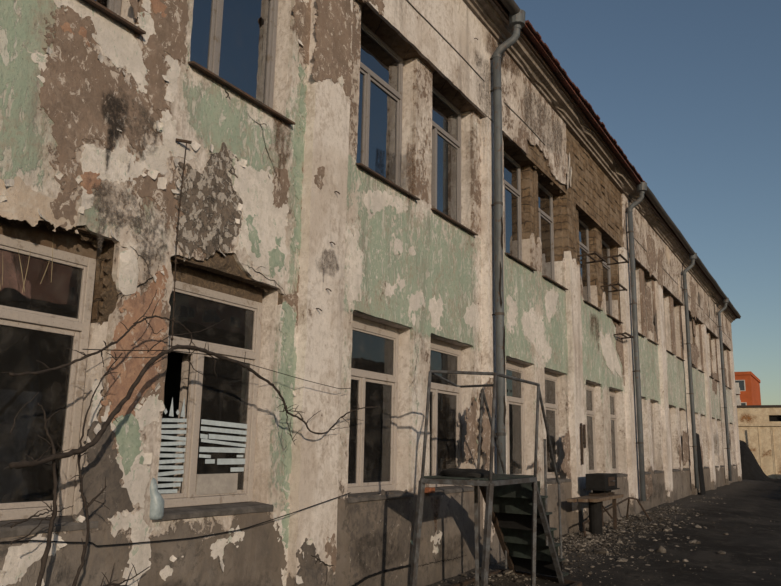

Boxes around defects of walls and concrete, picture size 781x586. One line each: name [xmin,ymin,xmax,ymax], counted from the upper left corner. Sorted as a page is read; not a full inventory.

peeling [292,0,355,100]
mould [102,94,157,171]
peeling [363,190,408,219]
peeling [391,229,416,256]
peeling [0,0,300,586]
peeling [385,273,406,297]
peeling [408,291,446,331]
peeling [506,287,559,362]
peeling [598,322,625,386]
peeling [463,375,497,470]